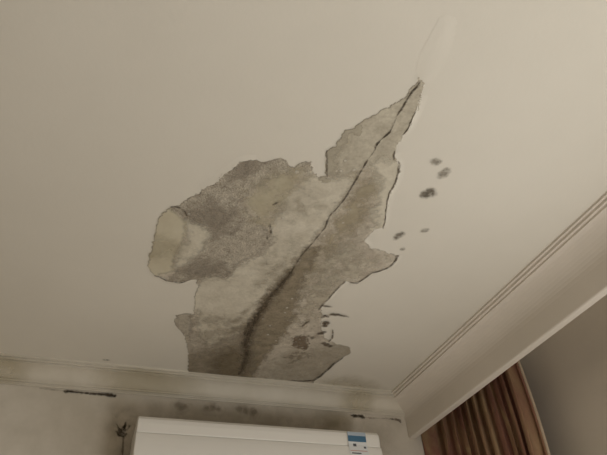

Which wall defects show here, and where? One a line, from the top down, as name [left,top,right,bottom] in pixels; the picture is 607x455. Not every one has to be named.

peeling [147,80,428,383]
damp [311,305,347,347]
crack [239,83,420,374]